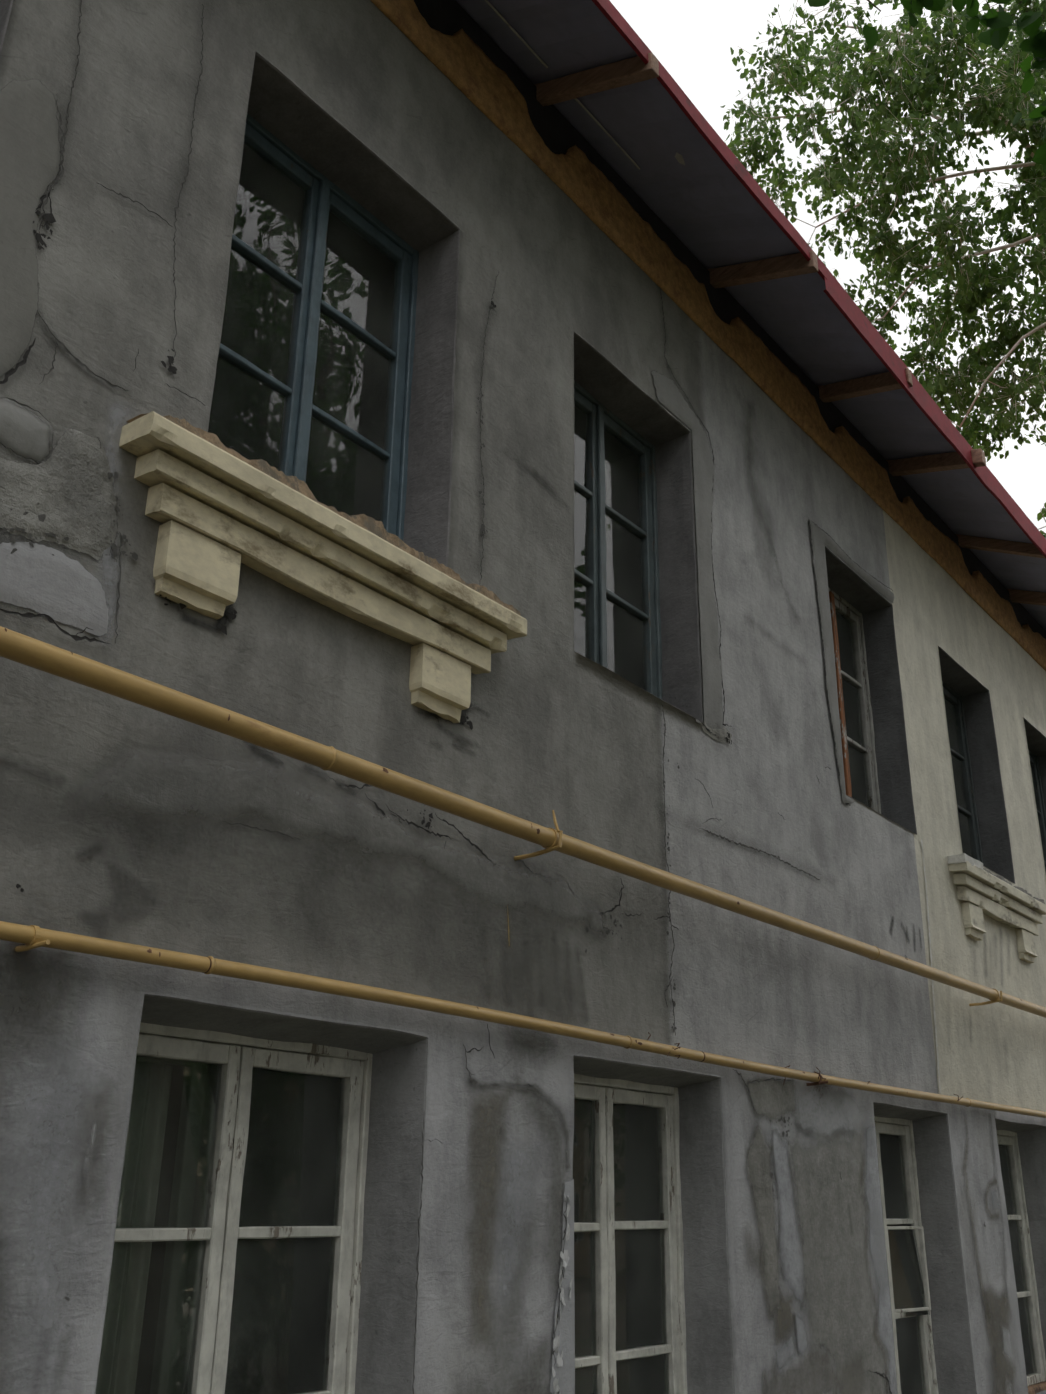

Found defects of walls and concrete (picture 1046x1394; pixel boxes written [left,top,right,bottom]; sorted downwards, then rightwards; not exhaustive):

crack [33,0,204,405]
spalling [0,428,138,561]
crack [339,705,678,1036]
leakage [471,1079,533,1332]
peeling [550,1179,575,1394]
leakage [771,1098,898,1394]